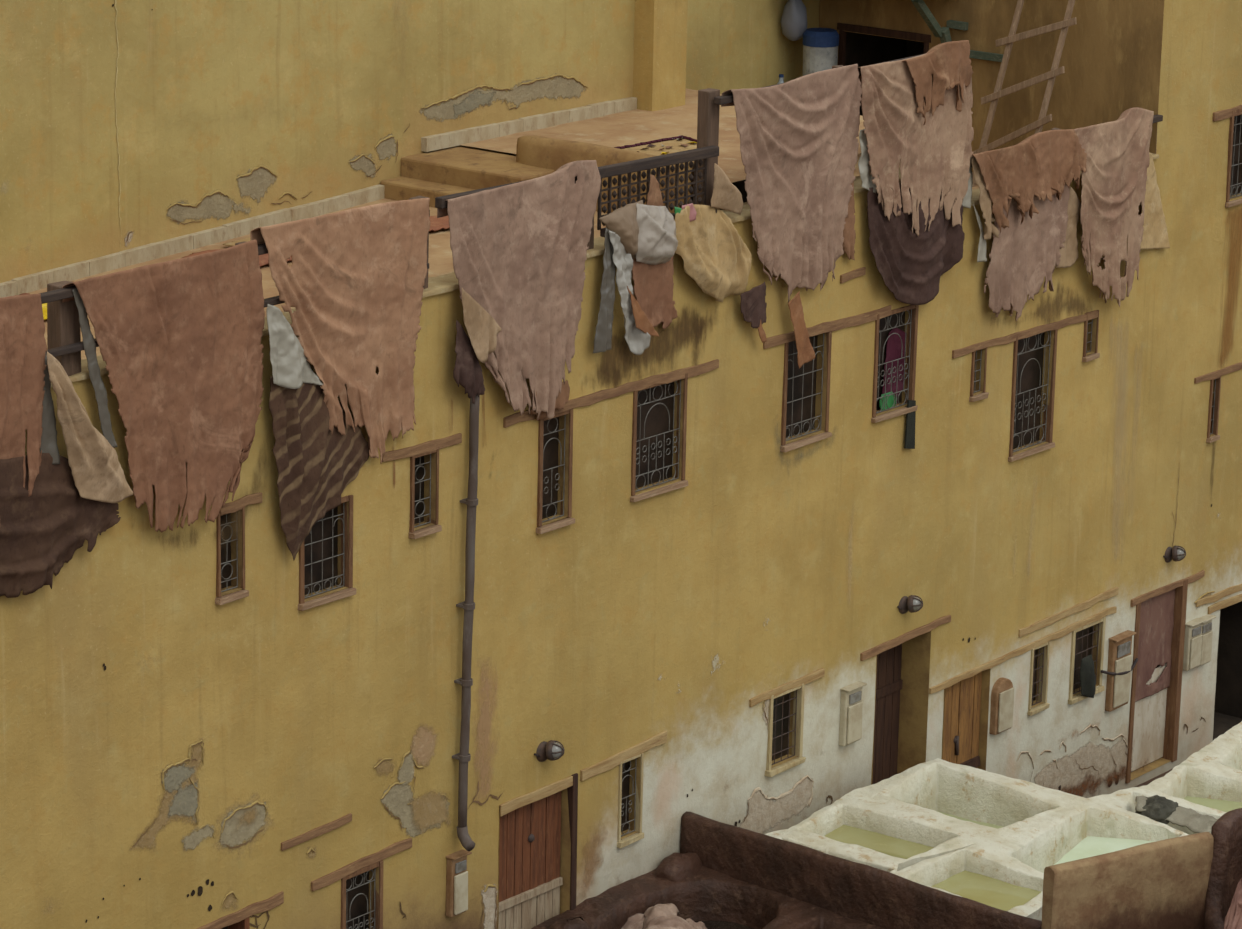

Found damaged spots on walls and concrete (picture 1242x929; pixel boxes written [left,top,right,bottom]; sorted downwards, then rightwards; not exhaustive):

flaking render [420,74,587,122]
flaking render [349,123,410,178]
flaking render [167,165,311,225]
peeling [131,740,267,851]
peeling [374,727,450,837]
flaking render [735,775,814,833]